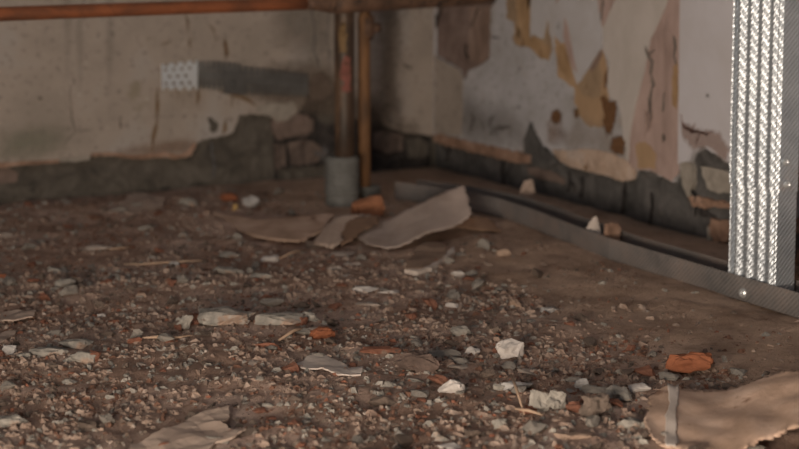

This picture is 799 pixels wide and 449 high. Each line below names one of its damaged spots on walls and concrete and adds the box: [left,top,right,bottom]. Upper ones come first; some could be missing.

spalling [435,3,494,79]
spalling [0,101,335,211]
spalling [370,115,730,243]